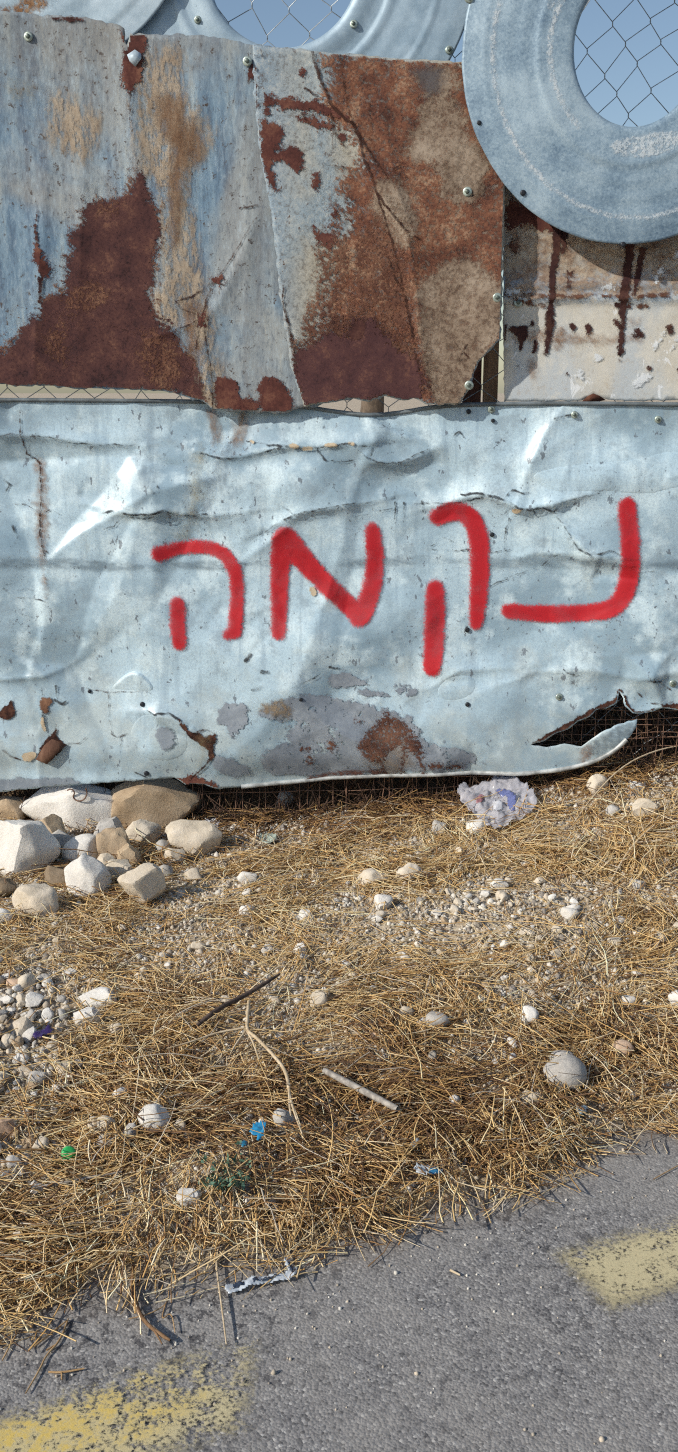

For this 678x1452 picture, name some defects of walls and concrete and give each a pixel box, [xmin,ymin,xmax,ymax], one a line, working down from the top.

corrosion [0,52,678,442]
crack [301,51,424,390]
corrosion [300,712,466,779]